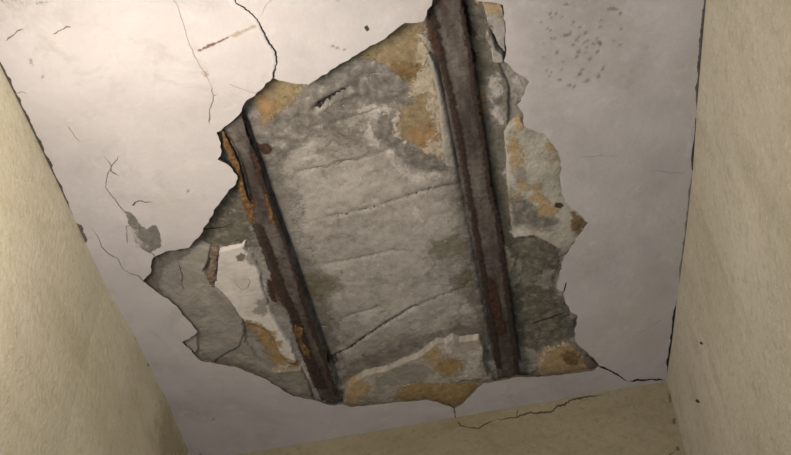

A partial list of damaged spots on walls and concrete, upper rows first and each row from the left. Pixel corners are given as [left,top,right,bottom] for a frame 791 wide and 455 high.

crack [174,1,257,121]
crack [228,0,278,78]
crack [695,0,706,110]
spalling [125,12,498,407]
spalling [461,0,598,376]
crack [663,171,692,280]
crack [599,302,677,382]
crack [453,395,598,429]